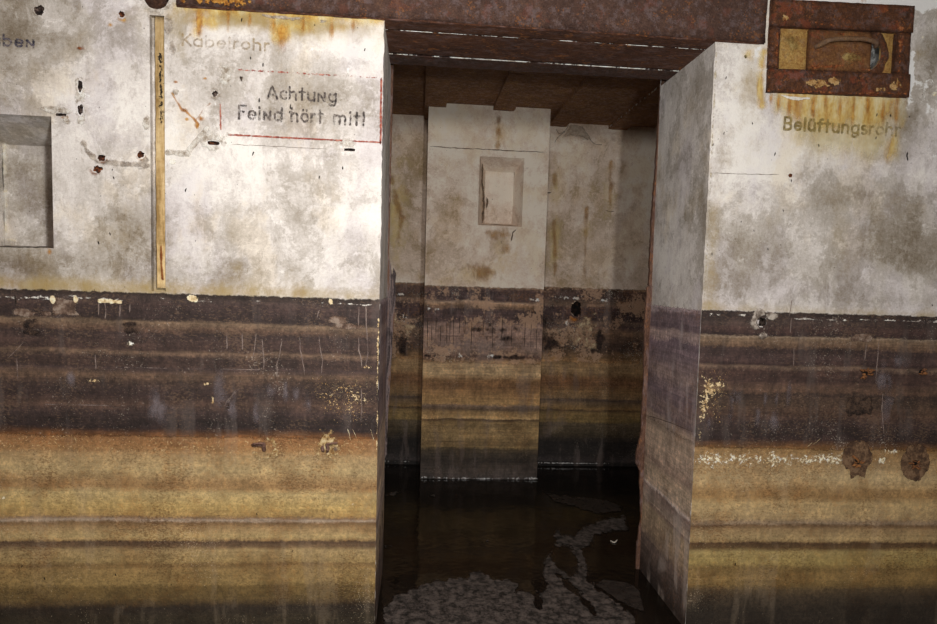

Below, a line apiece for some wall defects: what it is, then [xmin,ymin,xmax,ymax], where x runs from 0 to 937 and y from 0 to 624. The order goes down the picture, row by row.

spalling [145,0,175,52]
rust [185,8,251,33]
rust [268,13,333,41]
rust [757,50,899,150]
flaking render [750,309,778,339]
flaking render [316,430,340,461]
leakage [0,269,937,624]